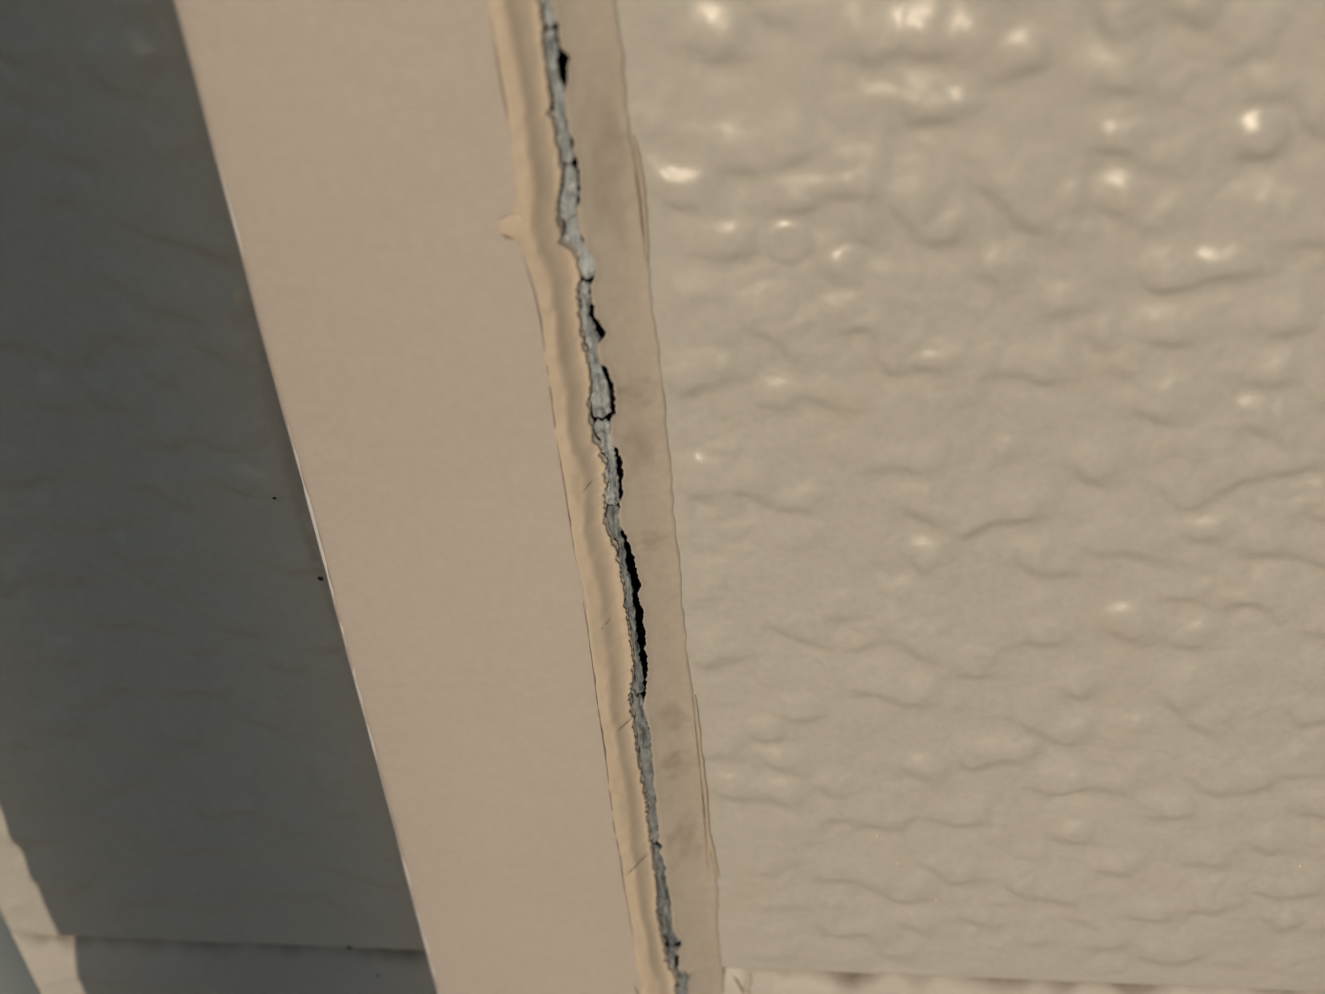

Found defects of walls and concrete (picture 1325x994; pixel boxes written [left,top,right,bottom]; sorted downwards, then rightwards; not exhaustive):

crack [522,0,689,994]